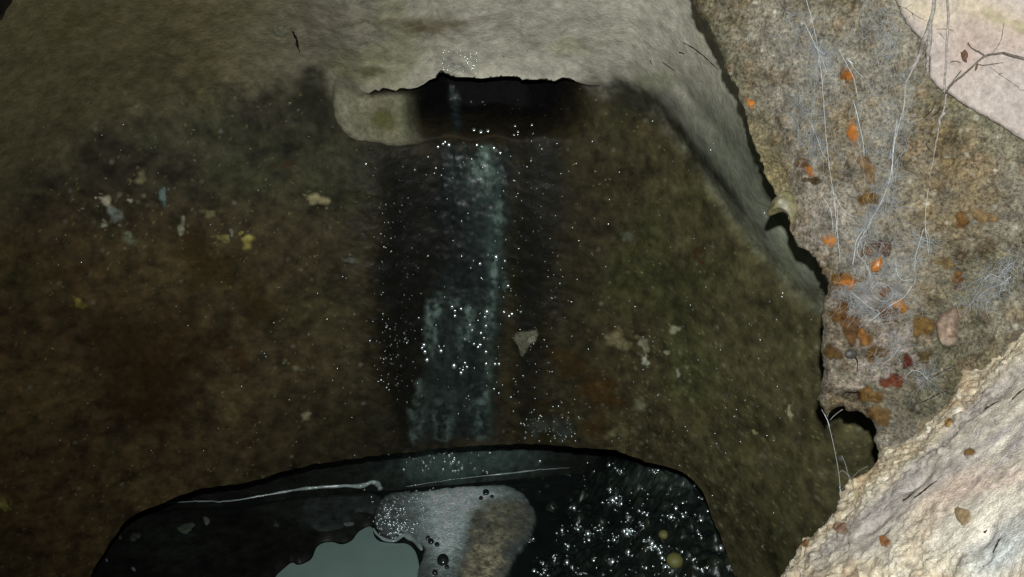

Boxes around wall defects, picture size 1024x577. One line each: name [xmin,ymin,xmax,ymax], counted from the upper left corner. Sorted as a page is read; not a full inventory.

damp [379,161,437,420]